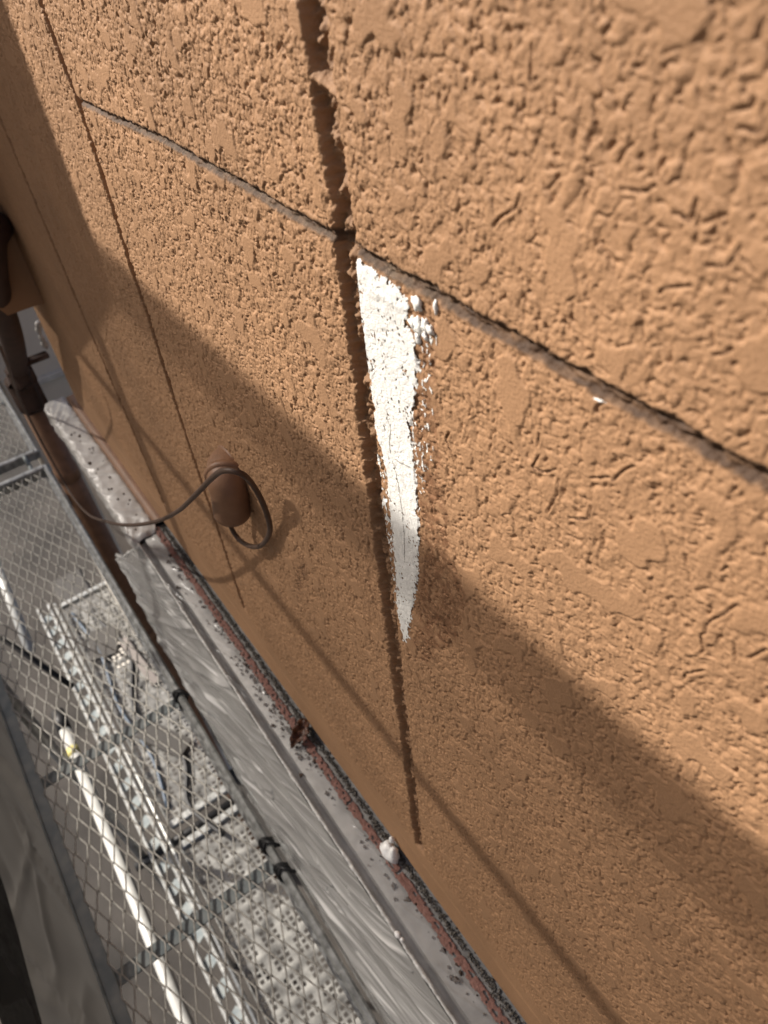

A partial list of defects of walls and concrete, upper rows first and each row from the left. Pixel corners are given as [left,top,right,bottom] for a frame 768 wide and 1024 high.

crack [386,409,409,562]